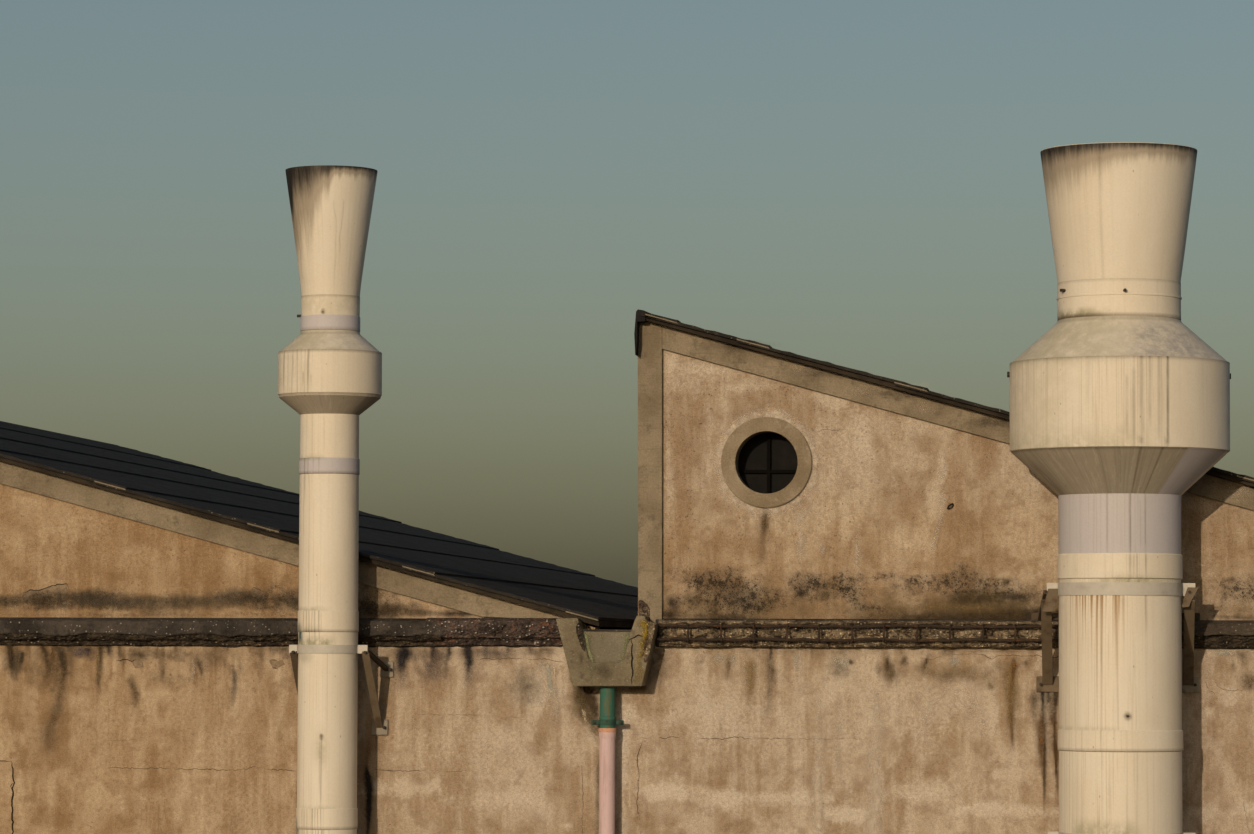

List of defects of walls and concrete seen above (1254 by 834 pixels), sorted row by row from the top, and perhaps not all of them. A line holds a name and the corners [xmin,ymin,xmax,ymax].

damp [6,646,24,670]
damp [398,647,409,669]
damp [427,647,472,671]
crack [6,761,15,834]